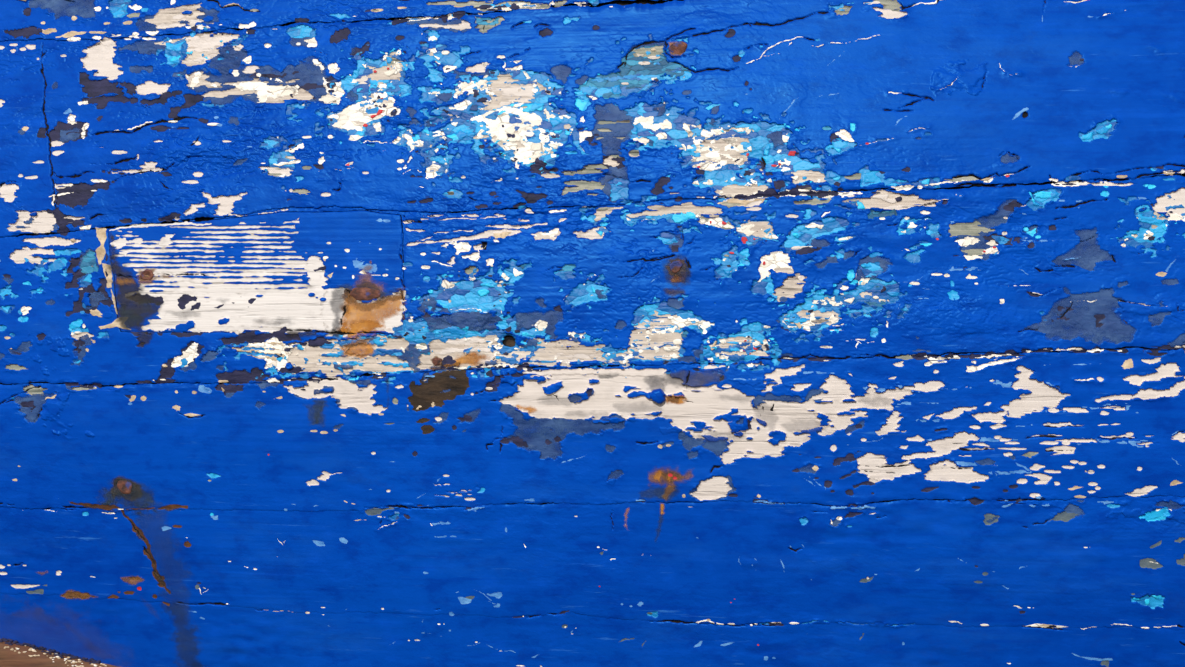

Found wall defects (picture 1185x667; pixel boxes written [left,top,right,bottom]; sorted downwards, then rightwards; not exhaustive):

crack [207,0,260,12]
crack [41,46,89,209]
peeling [0,0,1185,501]
rust [339,261,404,358]
rust [431,352,485,369]
rust [49,477,188,519]
rust [649,470,691,499]
rust [61,576,170,606]